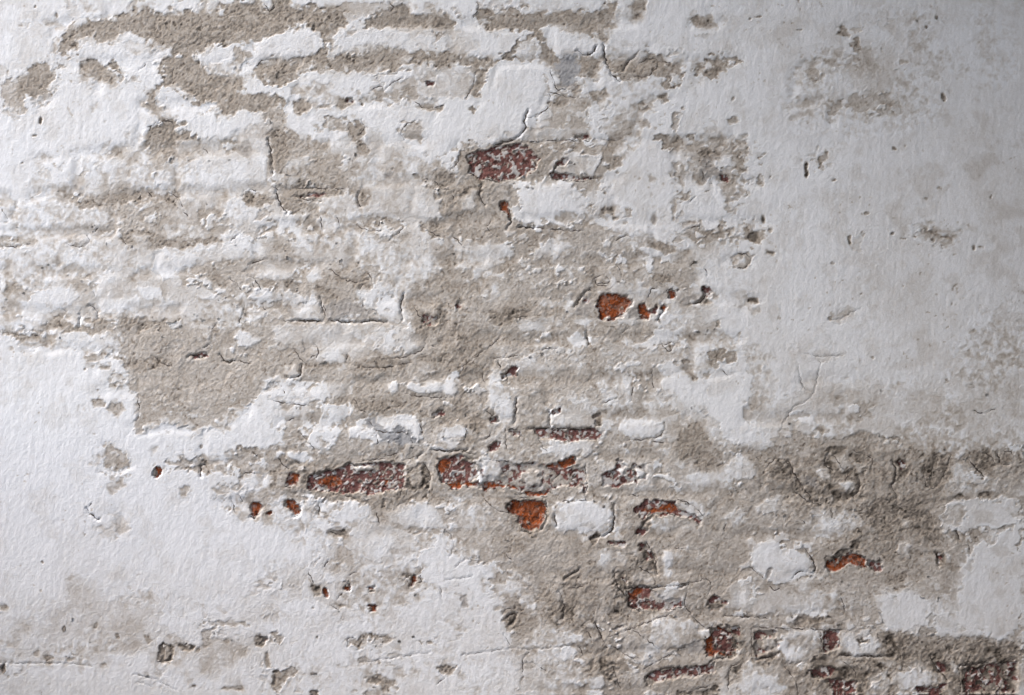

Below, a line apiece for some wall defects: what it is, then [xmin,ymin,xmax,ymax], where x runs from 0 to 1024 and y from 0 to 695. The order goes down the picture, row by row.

peeling [688,10,730,39]
peeling [473,0,687,142]
peeling [691,53,744,80]
peeling [0,0,500,369]
peeling [649,112,767,225]
peeling [681,220,767,260]
spalling [679,286,719,308]
spalling [683,319,710,335]
peeling [669,343,736,385]
peeling [77,396,126,419]
spalling [144,635,197,665]
spalling [254,631,298,694]